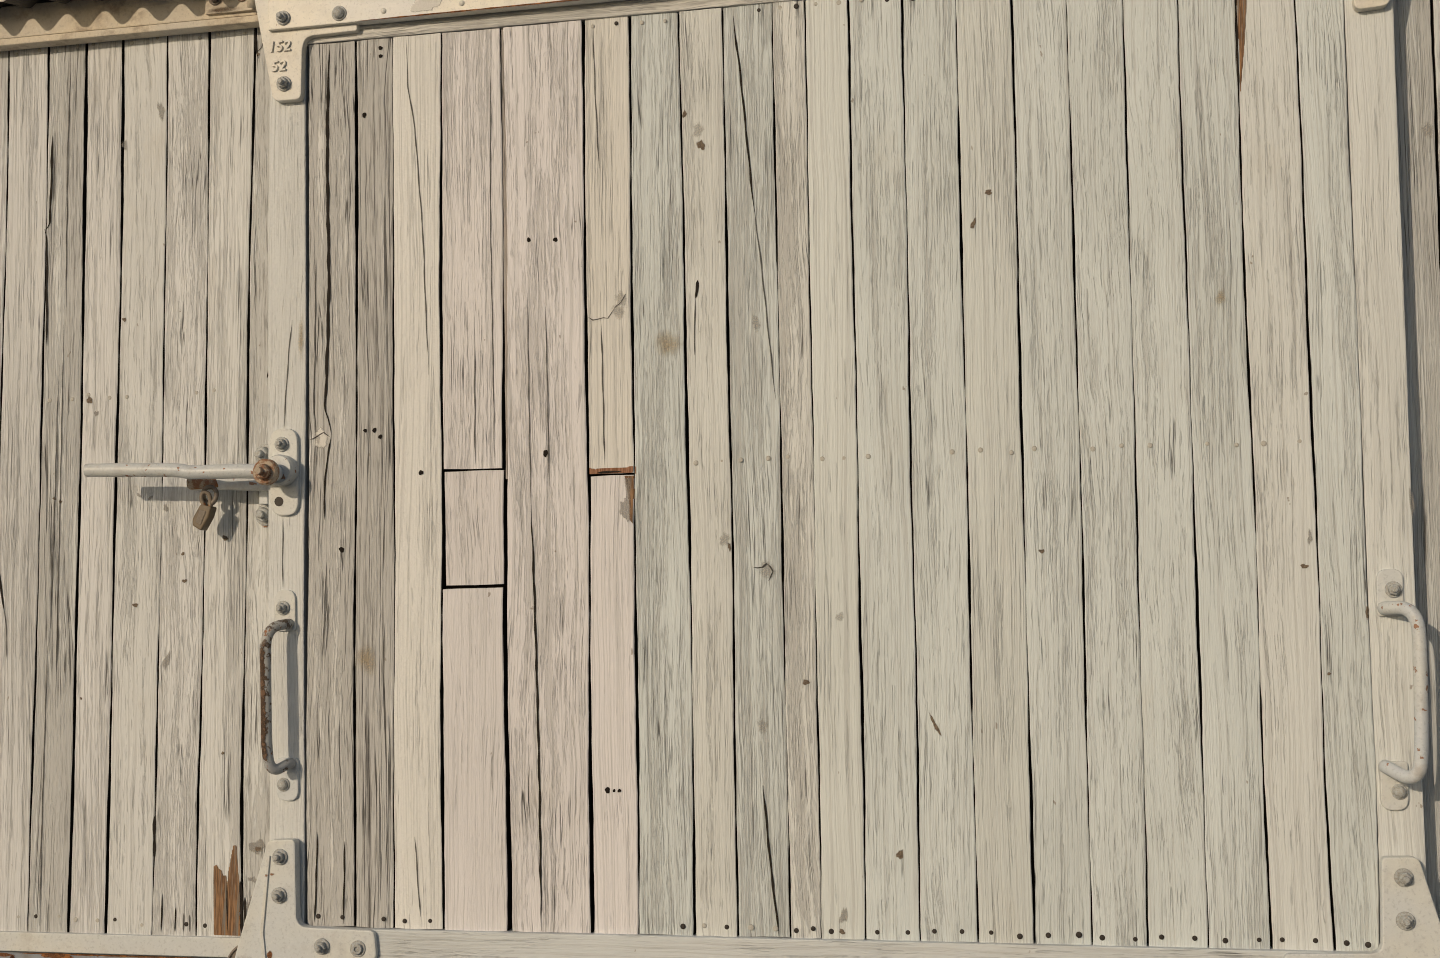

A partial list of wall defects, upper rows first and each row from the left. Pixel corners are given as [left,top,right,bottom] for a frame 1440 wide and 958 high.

crack [763,791,779,934]